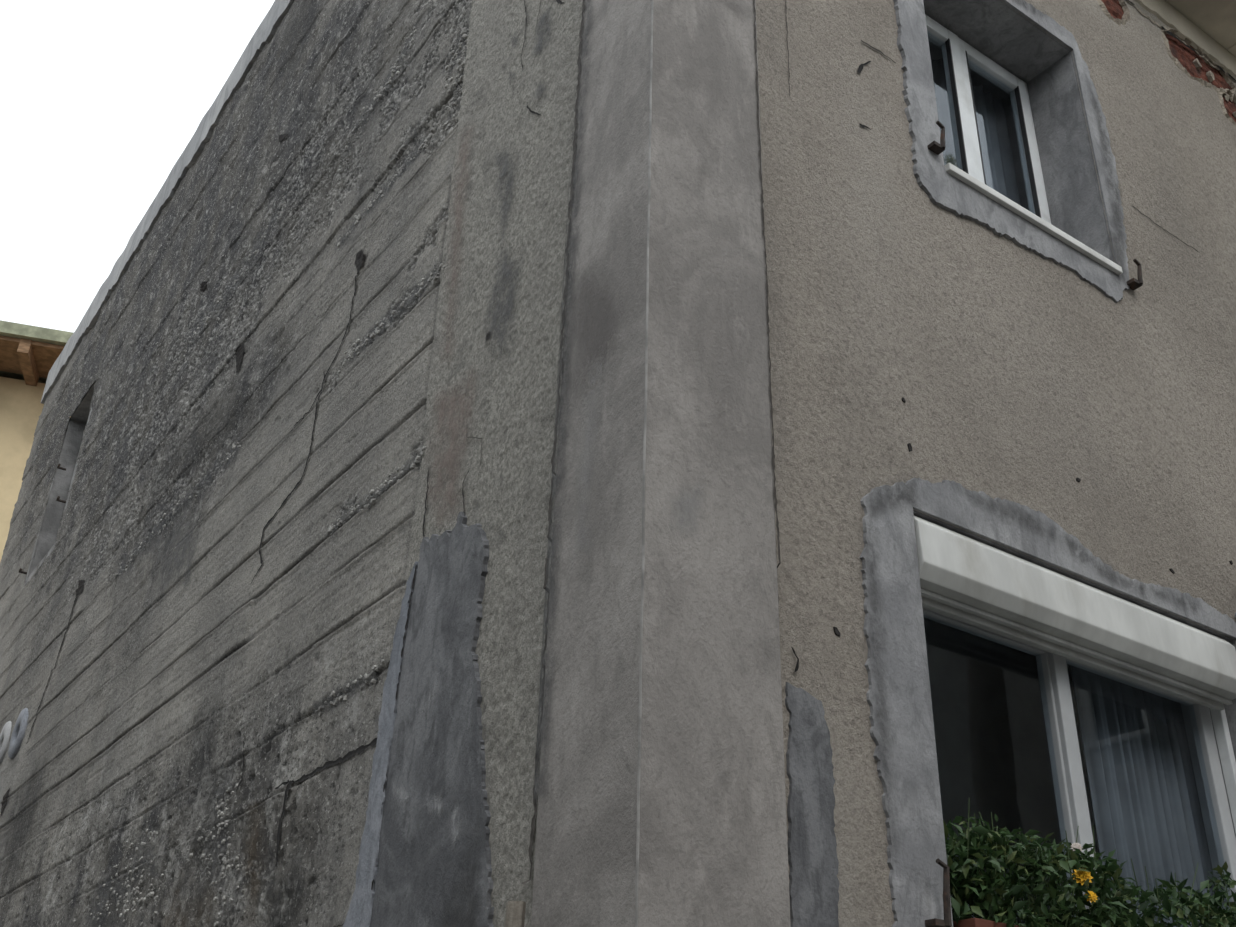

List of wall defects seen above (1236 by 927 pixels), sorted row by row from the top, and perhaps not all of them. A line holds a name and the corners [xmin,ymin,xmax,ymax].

spalling [1097,0,1131,26]
spalling [1161,26,1236,126]
crack [251,250,366,583]
crack [521,0,585,885]
crack [26,580,85,744]
crack [275,738,377,867]